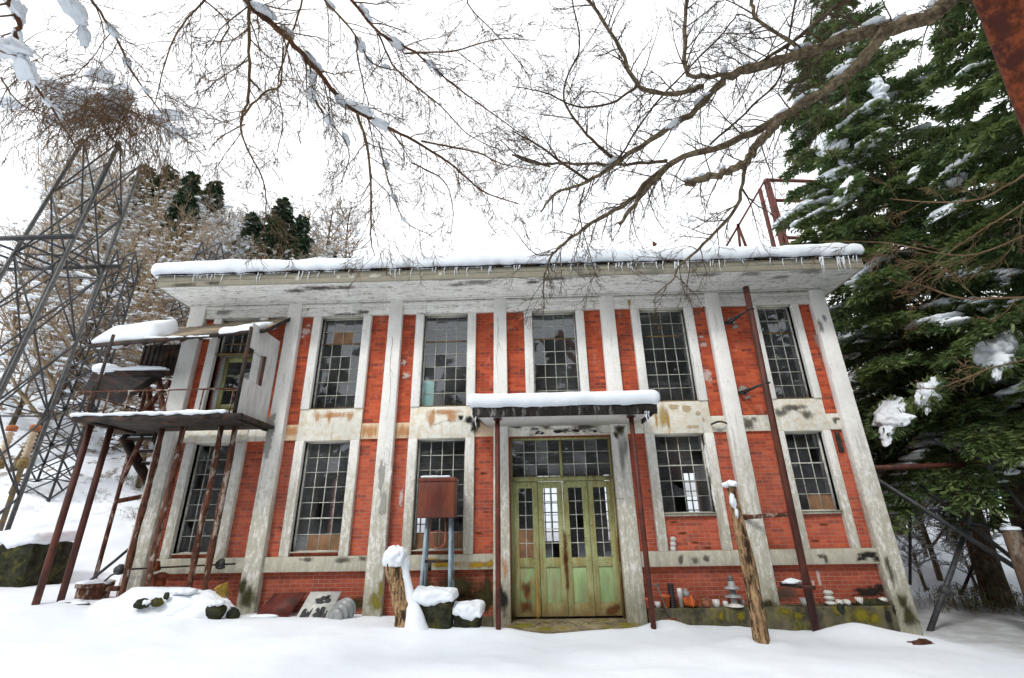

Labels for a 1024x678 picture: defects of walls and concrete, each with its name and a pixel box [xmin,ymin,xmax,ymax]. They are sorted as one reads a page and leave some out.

rust [429,410,455,425]
water stain [776,405,811,419]
peeling [378,447,392,515]
water stain [239,579,254,608]
rust [520,566,540,616]
rust [607,577,625,614]
water stain [763,588,803,619]
water stain [833,552,917,624]